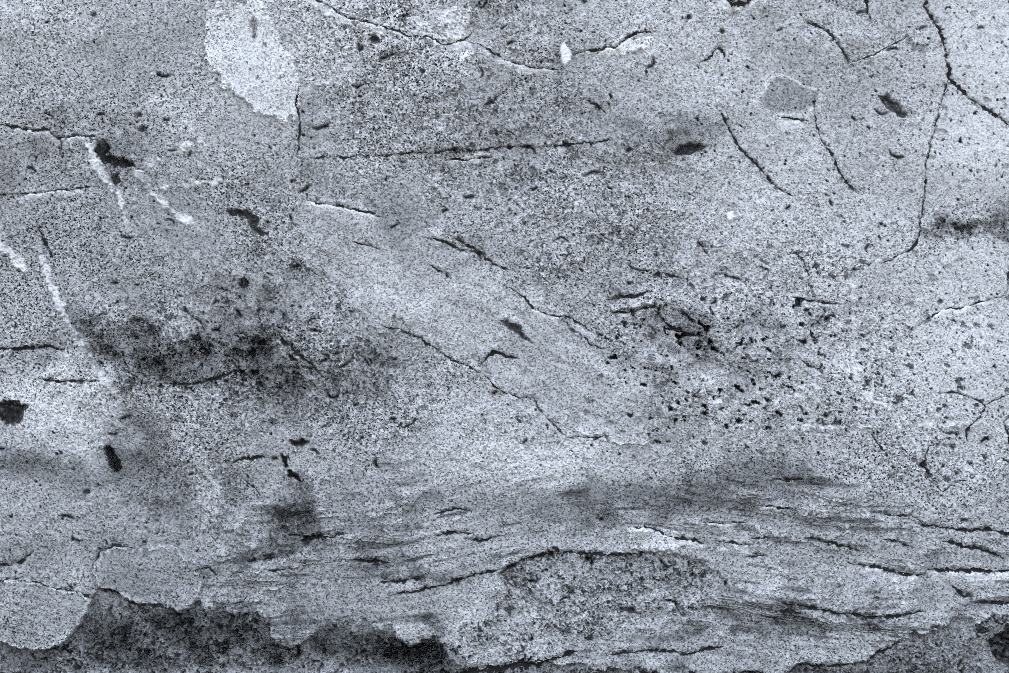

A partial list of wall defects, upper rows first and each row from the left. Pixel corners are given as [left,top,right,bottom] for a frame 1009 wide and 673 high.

crack [316,0,558,70]
crack [576,31,655,54]
crack [803,19,909,63]
crack [0,124,105,141]
crack [295,89,613,162]
crack [720,111,793,196]
crack [778,104,863,195]
crack [881,0,1009,264]
crack [428,236,602,349]
crack [608,272,704,336]
crack [921,391,1009,491]
peeling [129,454,1009,673]